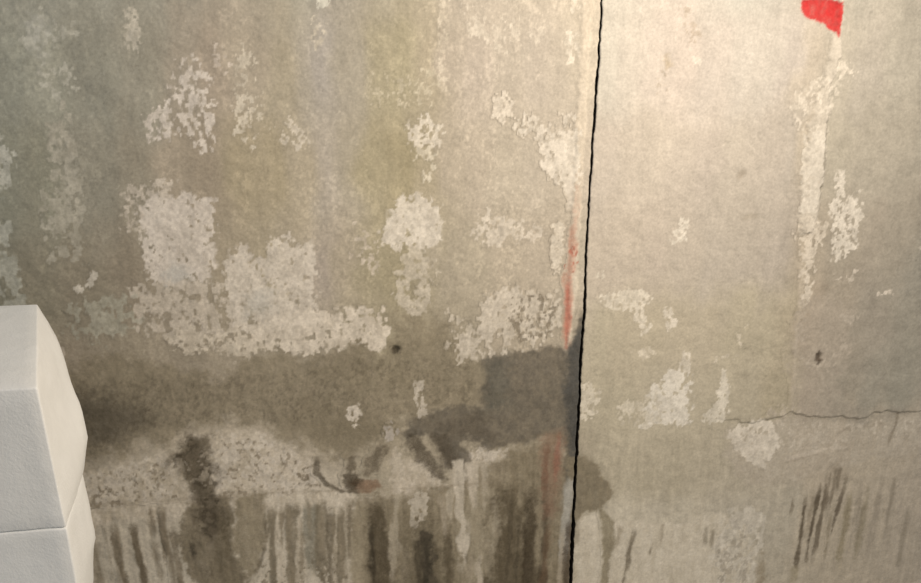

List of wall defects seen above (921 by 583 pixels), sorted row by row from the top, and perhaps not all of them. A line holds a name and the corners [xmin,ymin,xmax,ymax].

peeling [563,29,583,67]
peeling [0,132,19,201]
peeling [0,219,30,306]
peeling [10,0,565,366]
peeling [468,90,587,276]
corrosion [560,171,583,351]
crack [569,0,603,583]
peeling [789,59,865,307]
damp [66,304,639,583]
spalling [615,349,921,492]
damp [787,453,921,583]
crack [796,409,921,448]